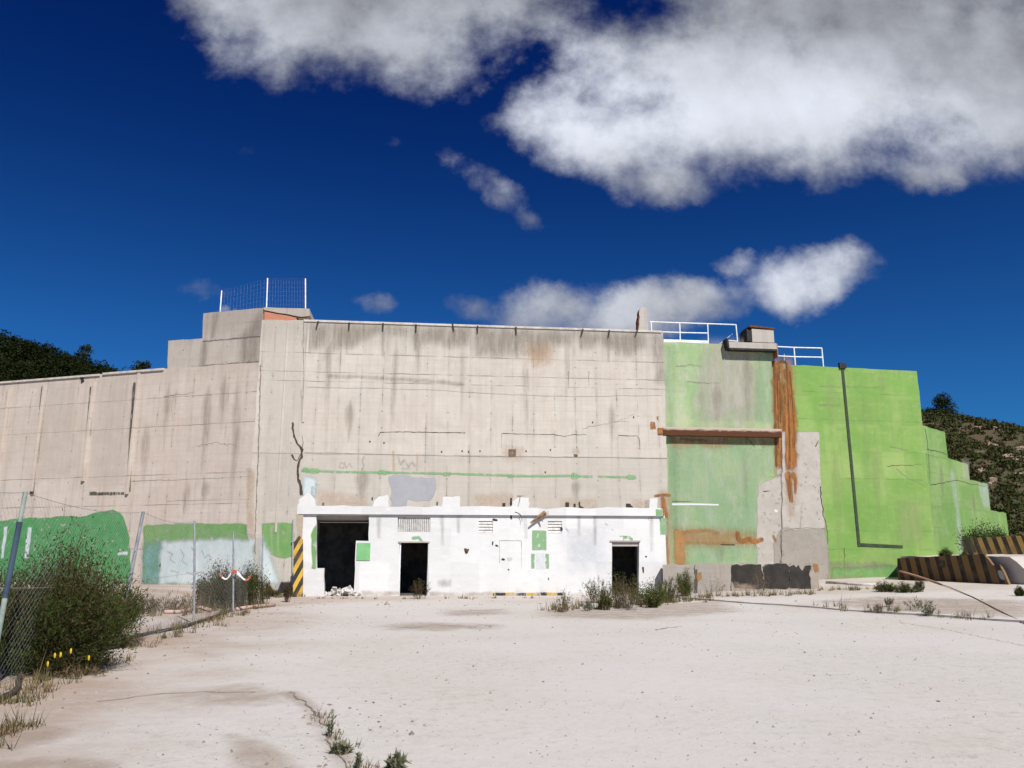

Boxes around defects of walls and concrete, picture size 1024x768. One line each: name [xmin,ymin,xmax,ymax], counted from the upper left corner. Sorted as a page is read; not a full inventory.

crack [291,422,309,495]
rust [667,530,776,564]
rust [772,344,797,502]
peeling [756,431,830,580]